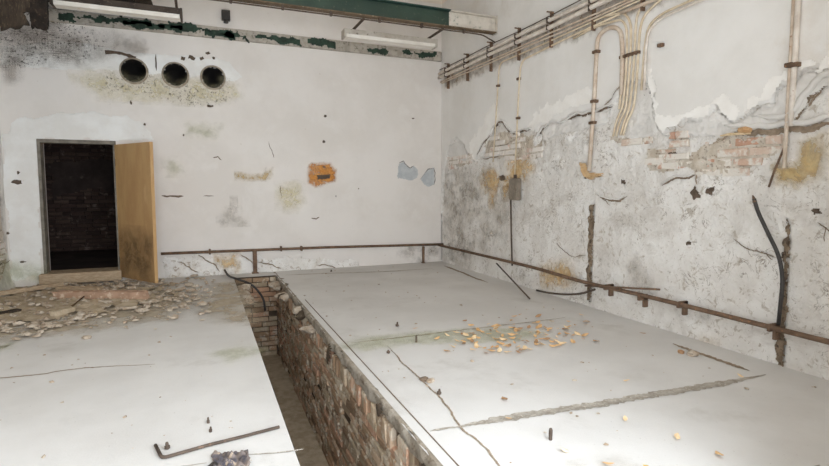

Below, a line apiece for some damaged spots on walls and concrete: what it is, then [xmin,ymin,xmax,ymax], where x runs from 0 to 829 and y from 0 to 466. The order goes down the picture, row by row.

peeling [57,13,336,49]
peeling [367,48,389,56]
peeling [403,49,437,58]
damp [776,142,821,182]
flaking render [397,56,829,381]
crack [1,364,150,378]
crack [353,317,766,466]
crack [249,448,302,456]